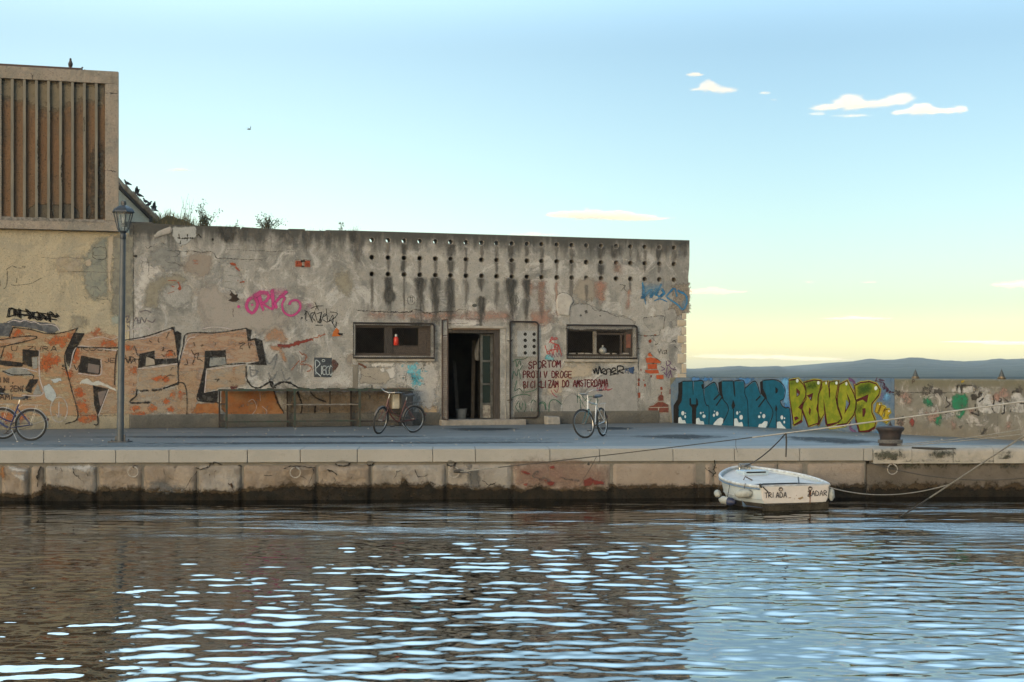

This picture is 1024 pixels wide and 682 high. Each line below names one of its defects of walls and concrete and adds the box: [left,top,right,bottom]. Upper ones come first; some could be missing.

damp [371,242,686,326]
flaking render [547,278,691,413]